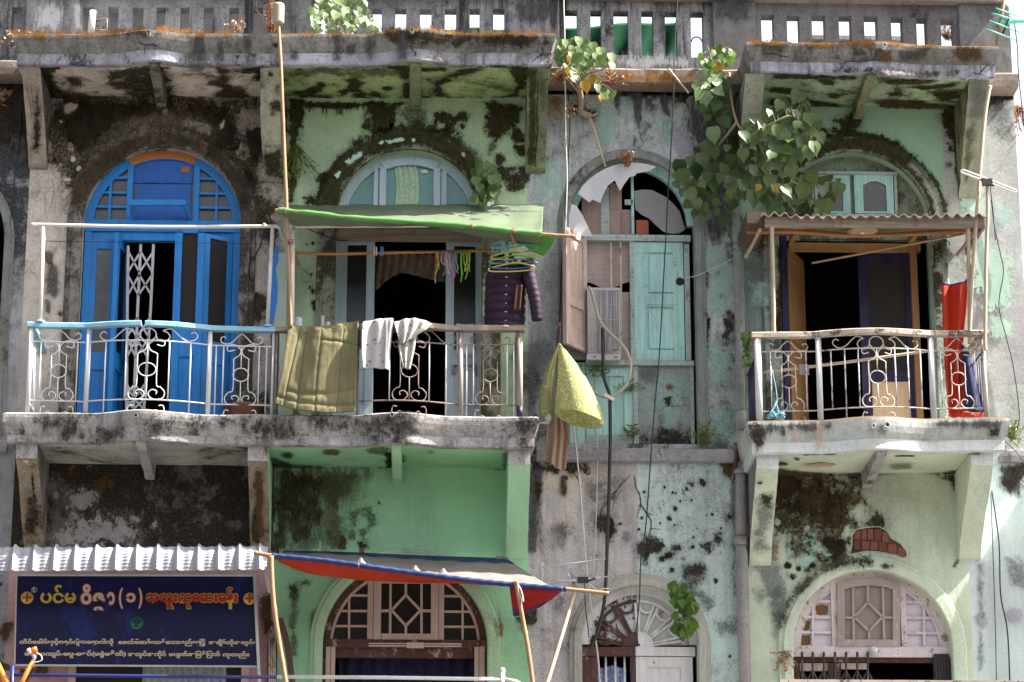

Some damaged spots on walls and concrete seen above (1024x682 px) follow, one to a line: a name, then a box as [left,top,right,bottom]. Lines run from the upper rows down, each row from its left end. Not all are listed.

damp [769,74,856,107]
damp [873,79,960,110]
damp [0,0,556,242]
damp [33,414,126,446]
damp [140,412,296,443]
damp [308,411,418,468]
damp [936,419,1002,437]
damp [270,451,380,554]
damp [528,457,732,609]
damp [748,421,893,635]
flaking render [850,526,907,558]
damp [516,609,538,628]